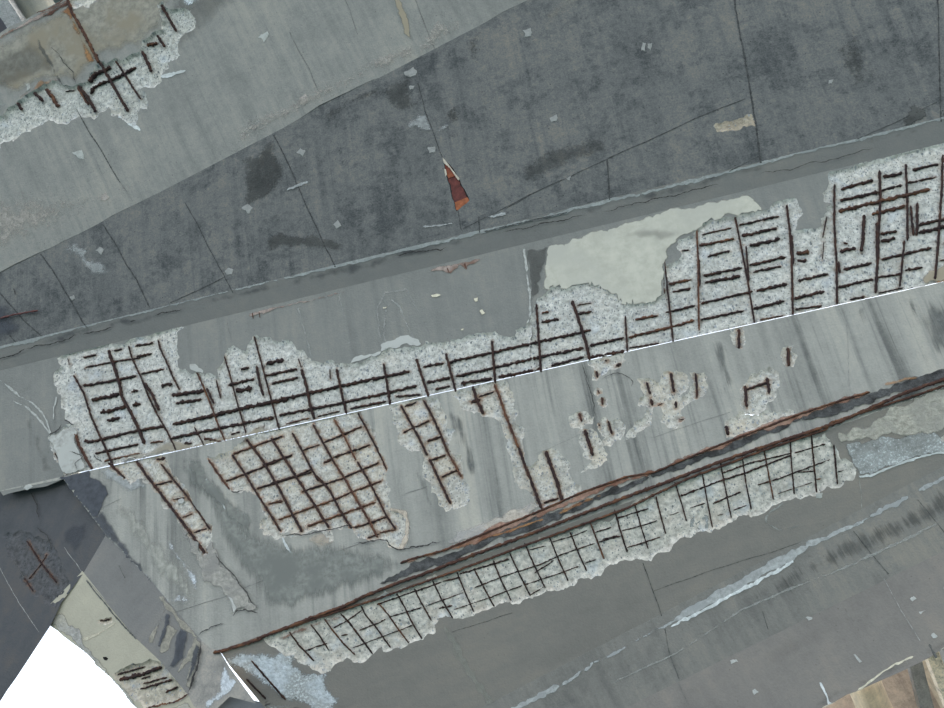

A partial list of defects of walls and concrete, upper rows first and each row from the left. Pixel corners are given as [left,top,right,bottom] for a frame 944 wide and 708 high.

spalling [0,0,196,148]
crack [504,184,717,232]
crack [0,320,135,359]
spalling [48,143,944,613]
rust [670,393,863,464]
spalling [2,530,70,609]
rust [428,470,652,557]
spalling [264,389,944,674]
spalling [111,659,187,708]